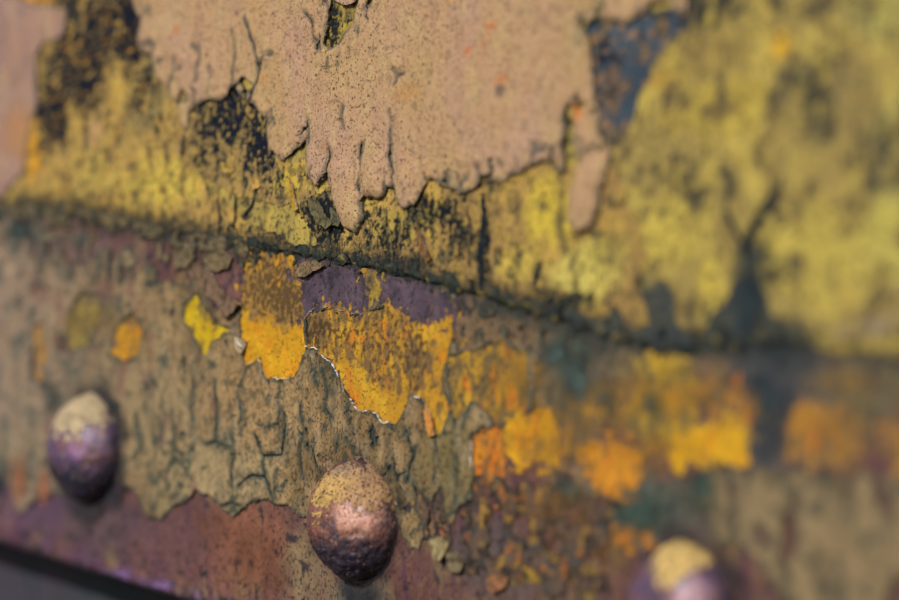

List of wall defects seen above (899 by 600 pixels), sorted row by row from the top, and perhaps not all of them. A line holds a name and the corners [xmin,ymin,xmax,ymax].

peeling [0,0,899,361]
crack [477,167,487,286]
crack [532,260,543,285]
crack [220,426,304,506]
crack [395,430,438,480]
peeling [173,234,762,600]
peeling [774,390,874,476]
rust [141,581,170,590]